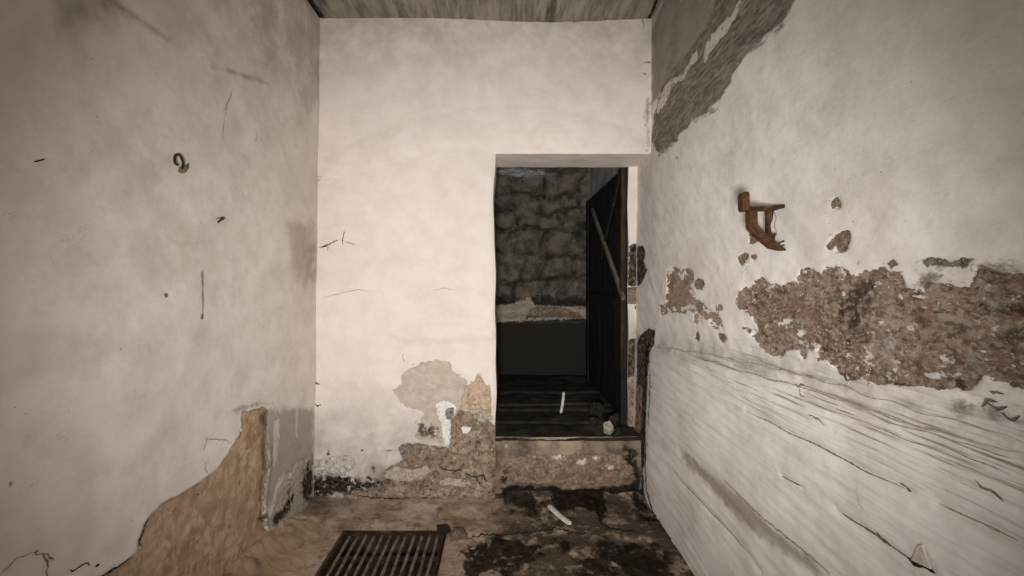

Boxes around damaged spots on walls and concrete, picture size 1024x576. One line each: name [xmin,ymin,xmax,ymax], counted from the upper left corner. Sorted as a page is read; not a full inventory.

peeling [652,0,794,156]
spalling [827,197,842,211]
spalling [660,267,727,343]
spalling [736,230,1024,422]
crack [1,550,100,576]
spalling [102,407,270,576]
peeling [392,360,491,446]
water stain [258,400,656,528]
water stain [460,534,674,576]
spalling [501,328,655,497]